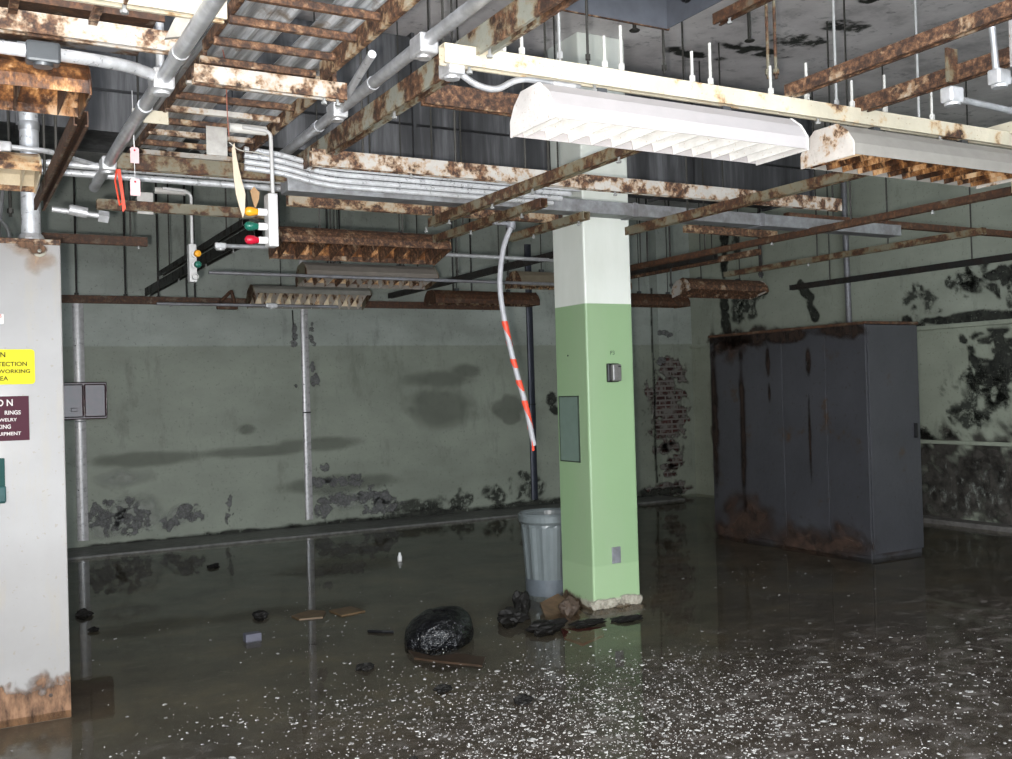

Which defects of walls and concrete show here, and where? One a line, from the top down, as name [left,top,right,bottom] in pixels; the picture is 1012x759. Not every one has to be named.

spalling [640,356,692,497]
mould [89,471,560,547]
corrosion [0,674,71,729]